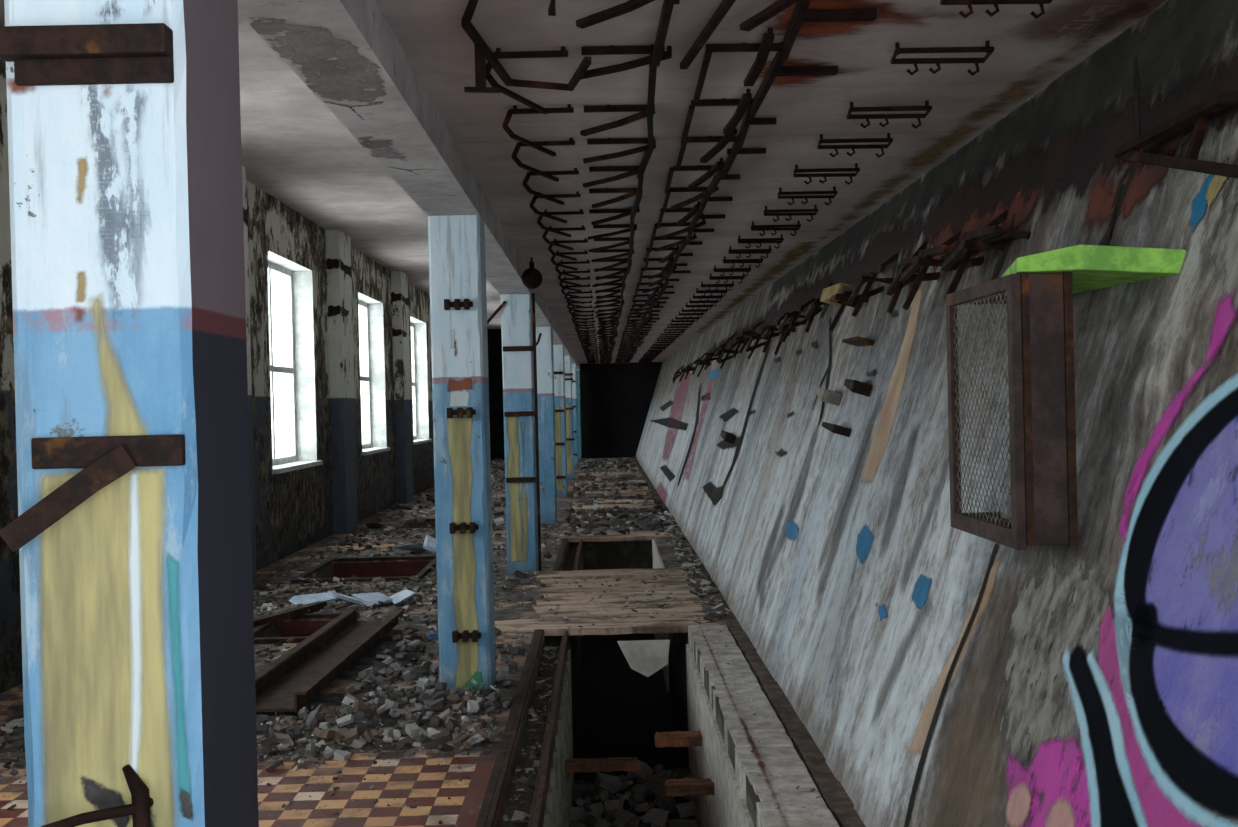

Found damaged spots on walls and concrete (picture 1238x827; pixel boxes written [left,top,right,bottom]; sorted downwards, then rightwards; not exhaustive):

peeling [88,86,146,309]
peeling [250,17,387,105]
peeling [359,137,406,160]
corrosion [769,0,921,38]
corrosion [707,44,1238,354]
peeling [255,192,332,485]